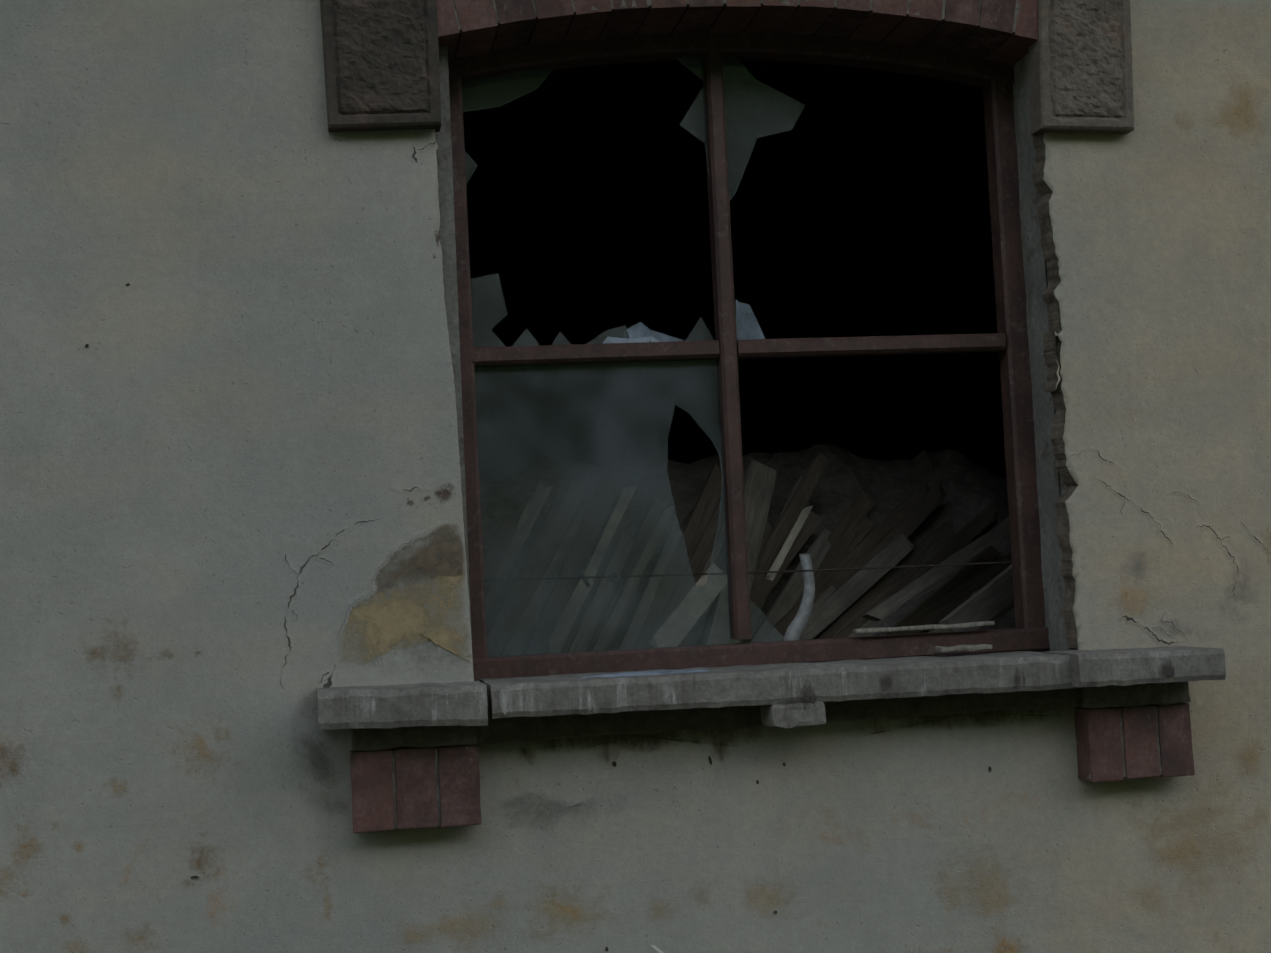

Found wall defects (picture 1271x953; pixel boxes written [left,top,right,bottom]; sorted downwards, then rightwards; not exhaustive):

crack [1069,445,1271,597]
crack [279,517,384,689]
crack [1114,607,1190,647]